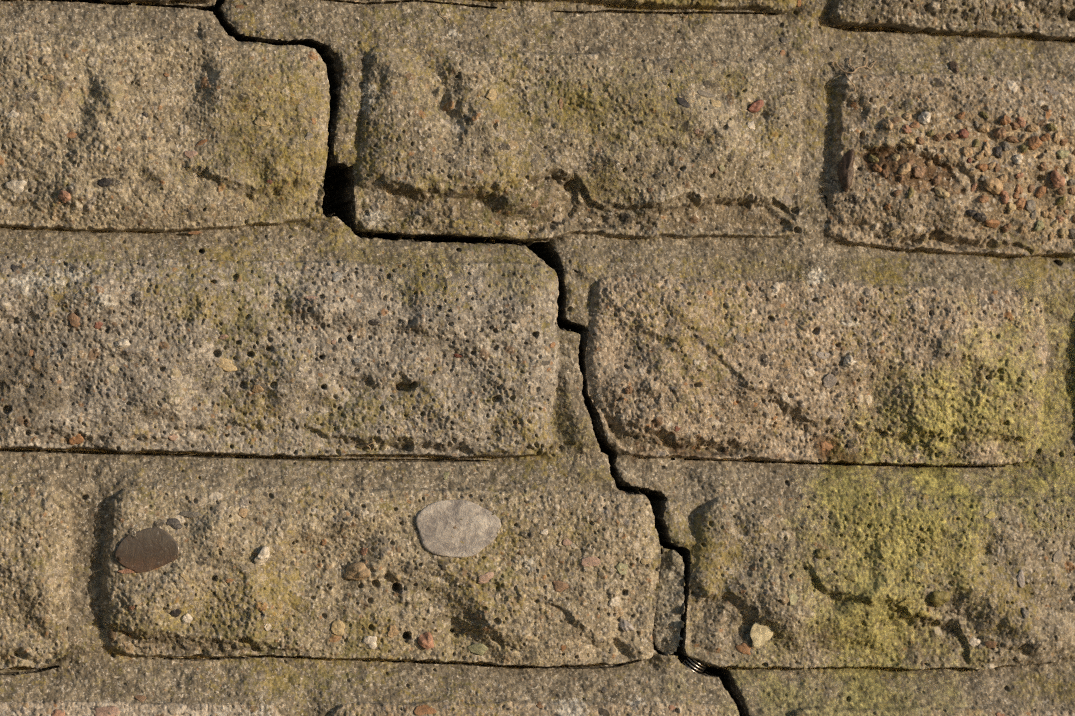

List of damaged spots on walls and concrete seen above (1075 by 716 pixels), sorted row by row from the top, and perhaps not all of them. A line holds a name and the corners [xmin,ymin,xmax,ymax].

crack [0,0,777,716]
crack [671,458,1005,468]